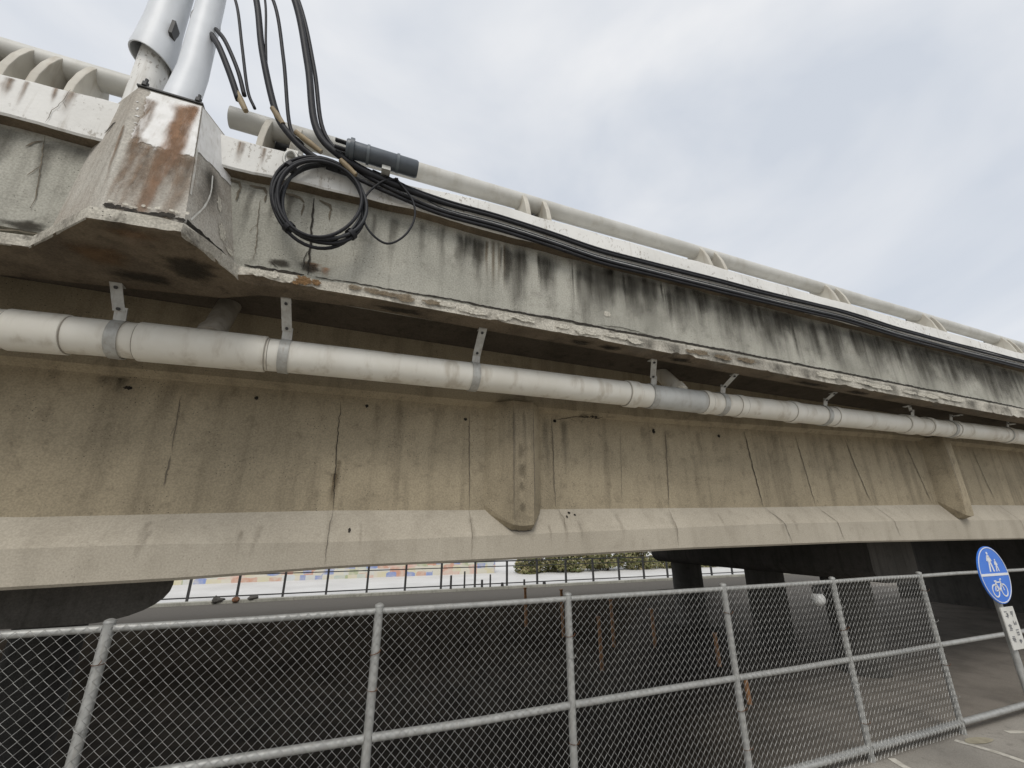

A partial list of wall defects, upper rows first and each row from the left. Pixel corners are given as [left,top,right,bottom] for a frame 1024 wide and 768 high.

crack [26,89,71,206]
corrosion [112,106,197,202]
spalling [348,284,535,323]
spalling [556,324,643,344]
spalling [816,372,964,402]
crack [164,398,181,484]
crack [325,402,341,561]
crack [744,433,789,534]